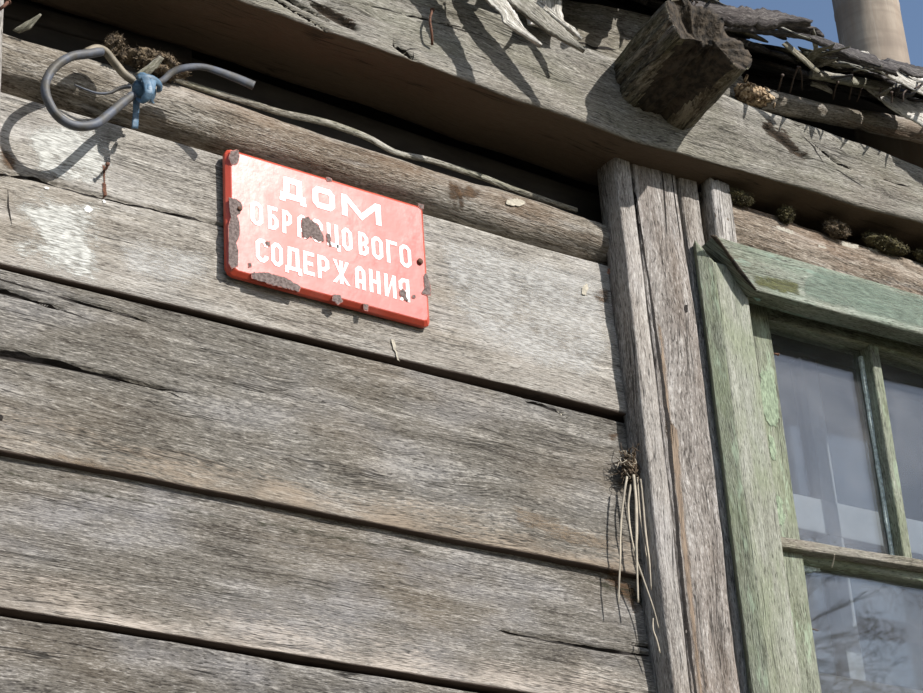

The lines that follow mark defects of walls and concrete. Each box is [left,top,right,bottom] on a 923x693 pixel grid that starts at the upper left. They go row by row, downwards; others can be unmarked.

crack [0,350,193,400]
crack [497,629,649,656]